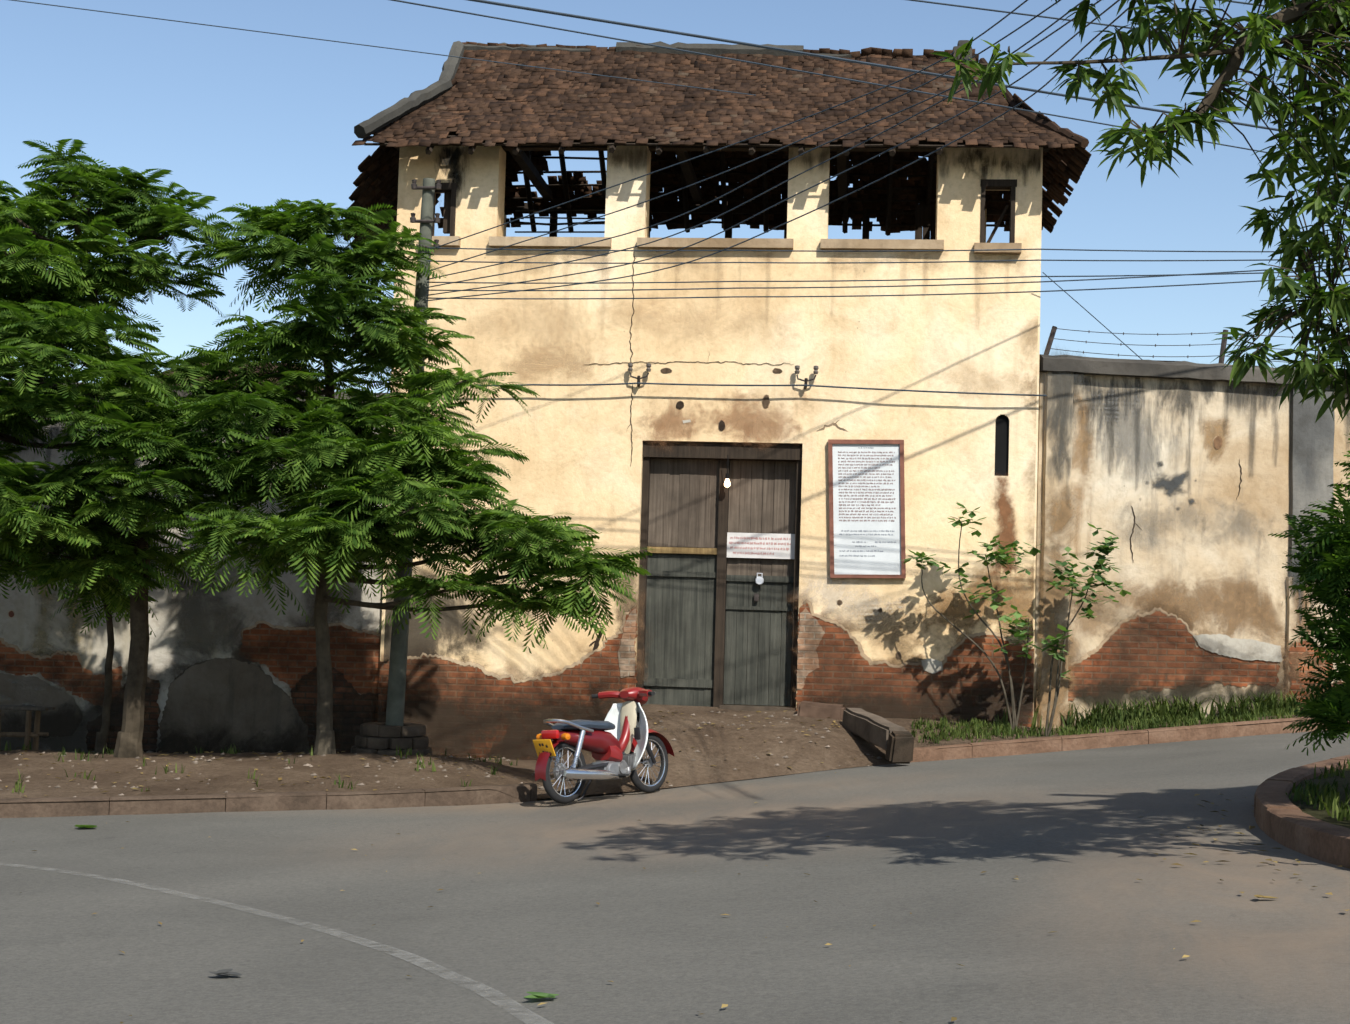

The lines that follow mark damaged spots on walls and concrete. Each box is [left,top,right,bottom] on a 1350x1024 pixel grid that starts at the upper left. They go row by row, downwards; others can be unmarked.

corrosion [993,478,1016,574]
leakage [935,356,1282,728]
spalling [0,638,126,750]
spalling [142,678,161,752]
spalling [237,621,390,752]
spalling [405,607,640,758]
spalling [795,599,1039,727]
spalling [1068,607,1345,710]